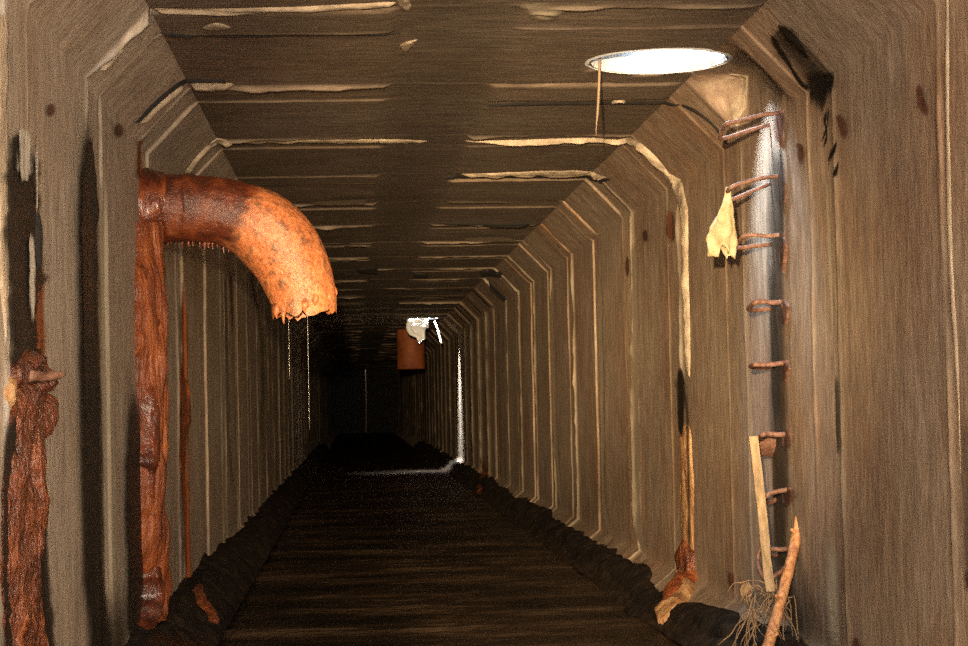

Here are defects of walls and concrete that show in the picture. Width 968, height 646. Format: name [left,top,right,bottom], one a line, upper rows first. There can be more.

corrosion [773,109,786,147]
leakage [771,25,834,109]
corrosion [0,284,59,646]
corrosion [134,221,229,630]
corrosion [654,405,697,625]
corrosion [759,429,791,457]